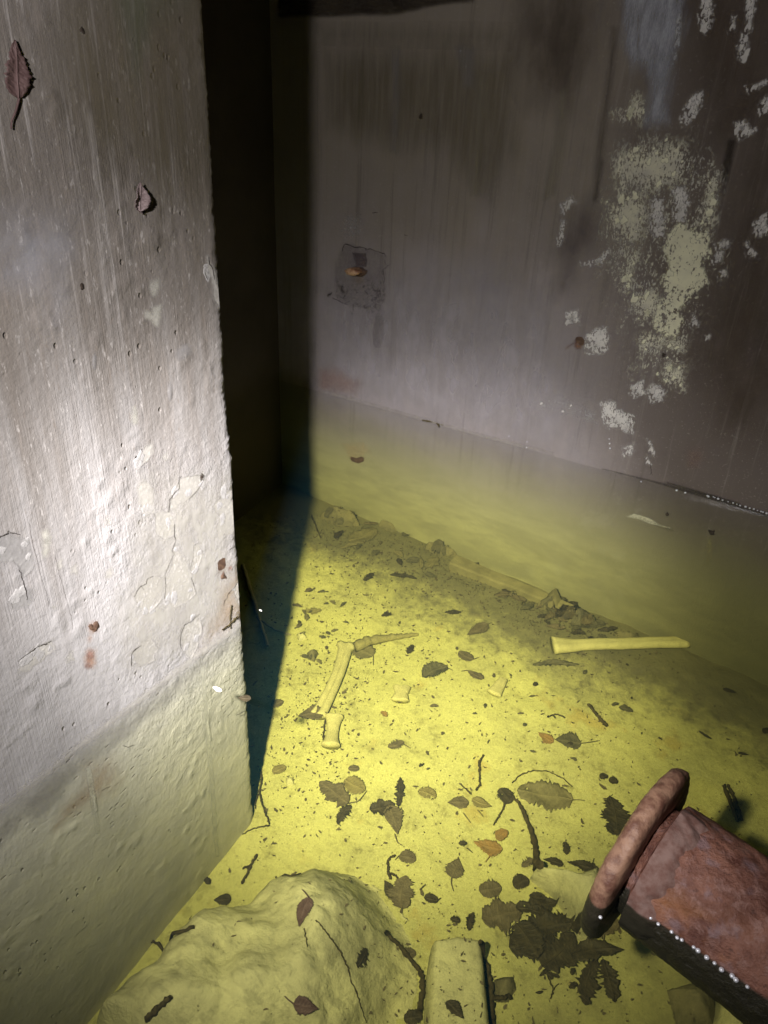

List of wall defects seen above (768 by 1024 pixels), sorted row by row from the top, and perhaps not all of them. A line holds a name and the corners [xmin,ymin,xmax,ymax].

peeling [697,0,712,34]
peeling [729,0,756,63]
peeling [537,398,635,457]